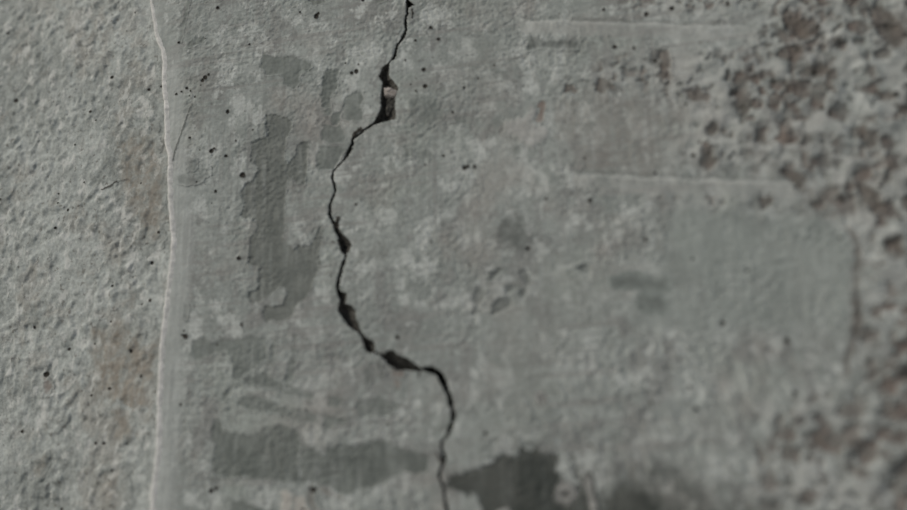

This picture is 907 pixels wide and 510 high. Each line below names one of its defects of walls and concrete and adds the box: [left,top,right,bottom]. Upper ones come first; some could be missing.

crack [325,0,459,510]